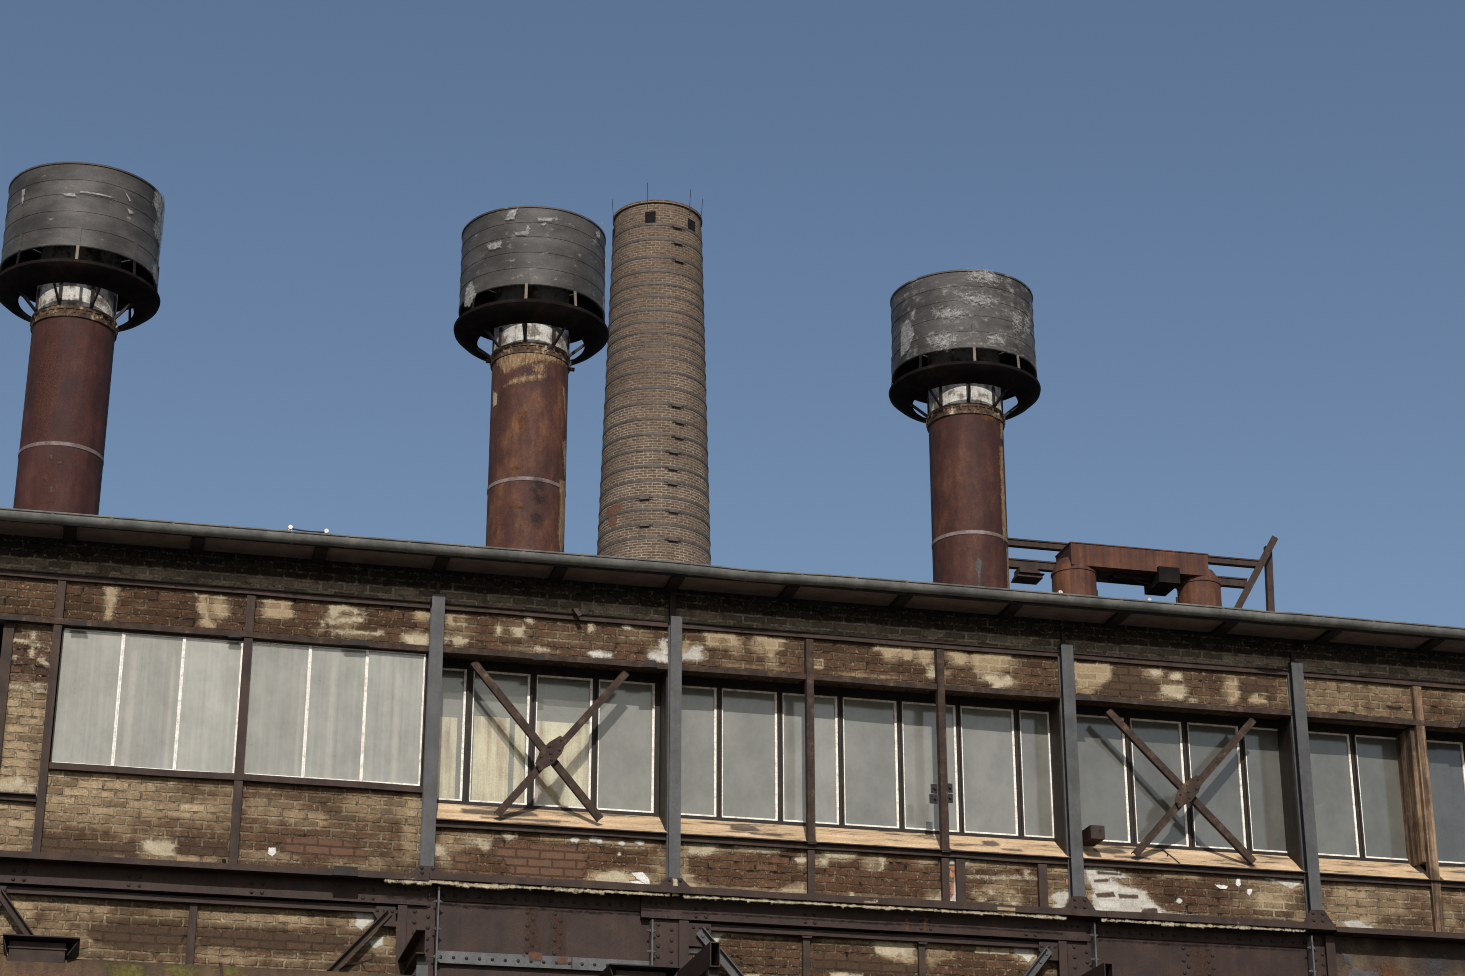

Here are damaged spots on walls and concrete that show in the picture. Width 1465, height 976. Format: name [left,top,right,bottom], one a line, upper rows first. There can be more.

rust [493,353,567,407]
rust [558,441,566,552]
rust [1000,423,1009,589]
peeling [196,593,229,628]
peeling [263,599,293,619]
peeling [321,605,384,638]
peeling [648,631,738,663]
peeling [755,635,787,659]
peeling [873,644,1011,674]
peeling [1074,661,1111,688]
peeling [1149,669,1197,703]
peeling [1084,867,1305,932]